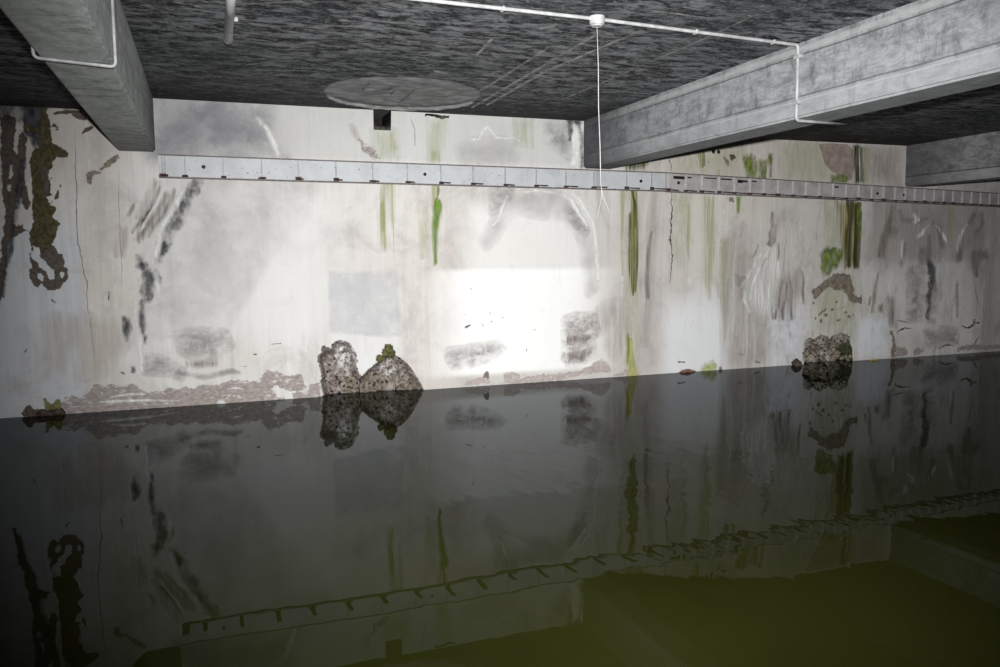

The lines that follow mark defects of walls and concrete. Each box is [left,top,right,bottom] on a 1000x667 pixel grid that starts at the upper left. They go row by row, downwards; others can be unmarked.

peeling [819,143,854,180]
water stain [57,181,196,373]
crack [667,194,675,282]
spalling [802,272,862,363]
water stain [821,200,862,275]
water stain [913,214,979,319]
peeling [21,405,39,417]
peeling [61,340,424,414]